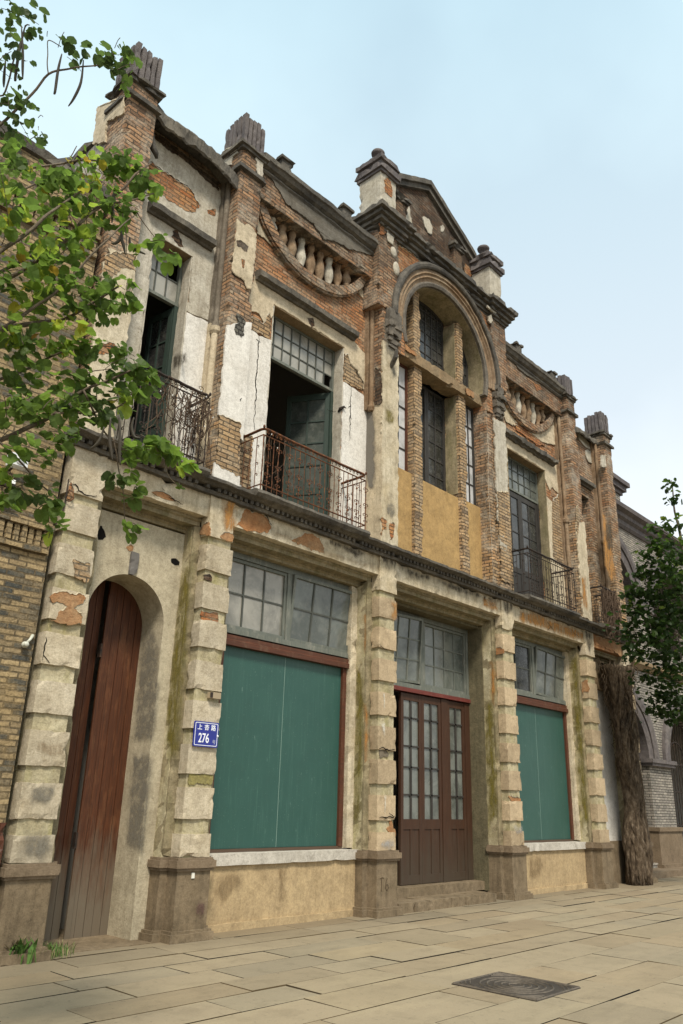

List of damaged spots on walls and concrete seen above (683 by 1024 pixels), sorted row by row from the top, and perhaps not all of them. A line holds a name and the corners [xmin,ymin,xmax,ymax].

spalling [148,161,216,216]
peeling [232,219,279,289]
crack [240,335,260,429]
spalling [343,353,383,405]
spalling [215,414,254,490]
spalling [199,509,271,542]
spalling [49,559,90,626]
water stain [135,570,189,754]
water stain [486,704,497,819]
water stain [571,658,588,822]